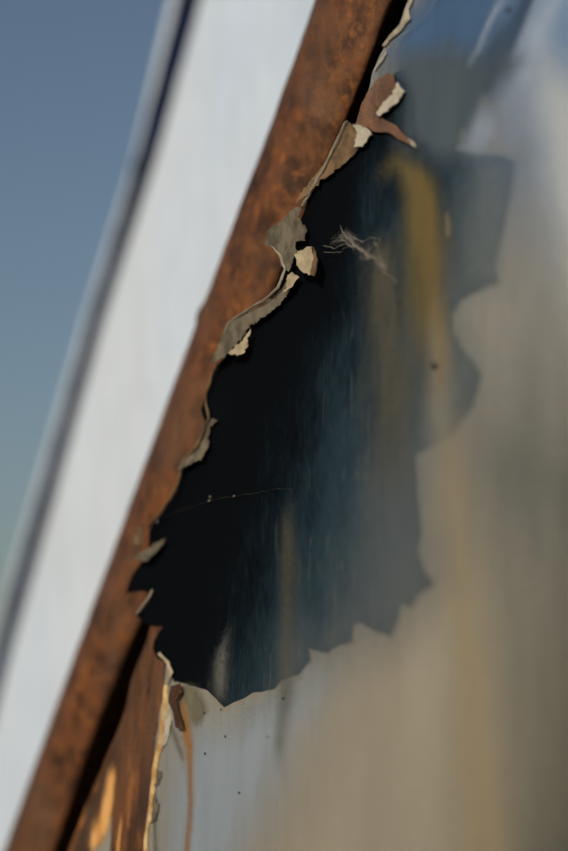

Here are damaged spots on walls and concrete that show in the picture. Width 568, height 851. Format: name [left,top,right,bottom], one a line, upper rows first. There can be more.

corrosion [356,73,416,148]
peeling [120,70,515,851]
corrosion [68,625,197,851]